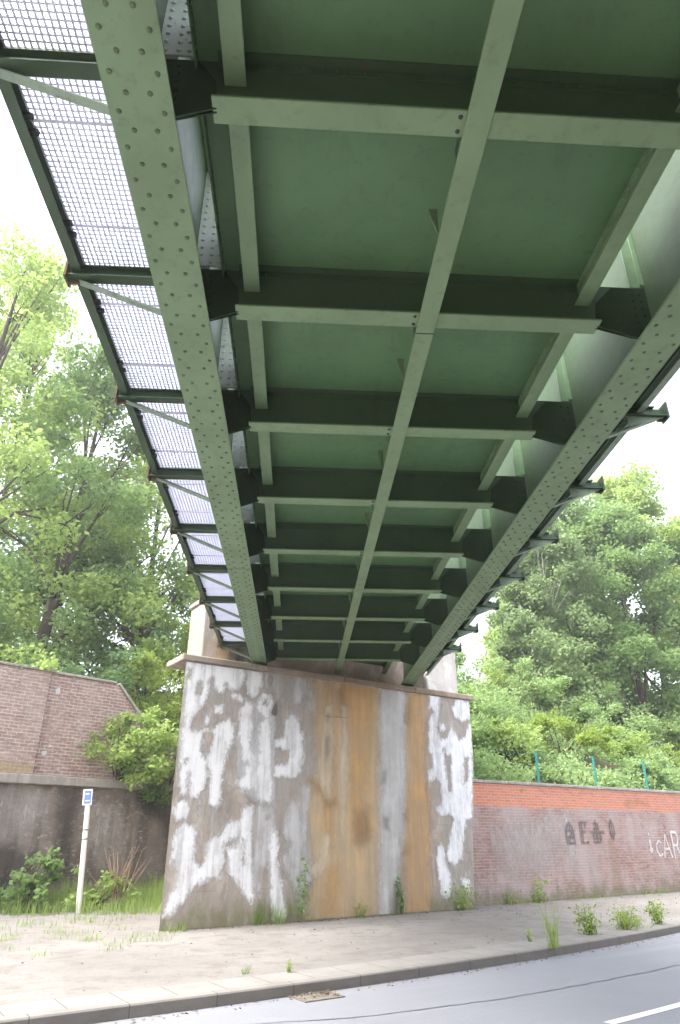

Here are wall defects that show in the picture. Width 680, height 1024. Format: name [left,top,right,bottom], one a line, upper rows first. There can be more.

rust [306,680,380,920]
rust [405,693,429,912]